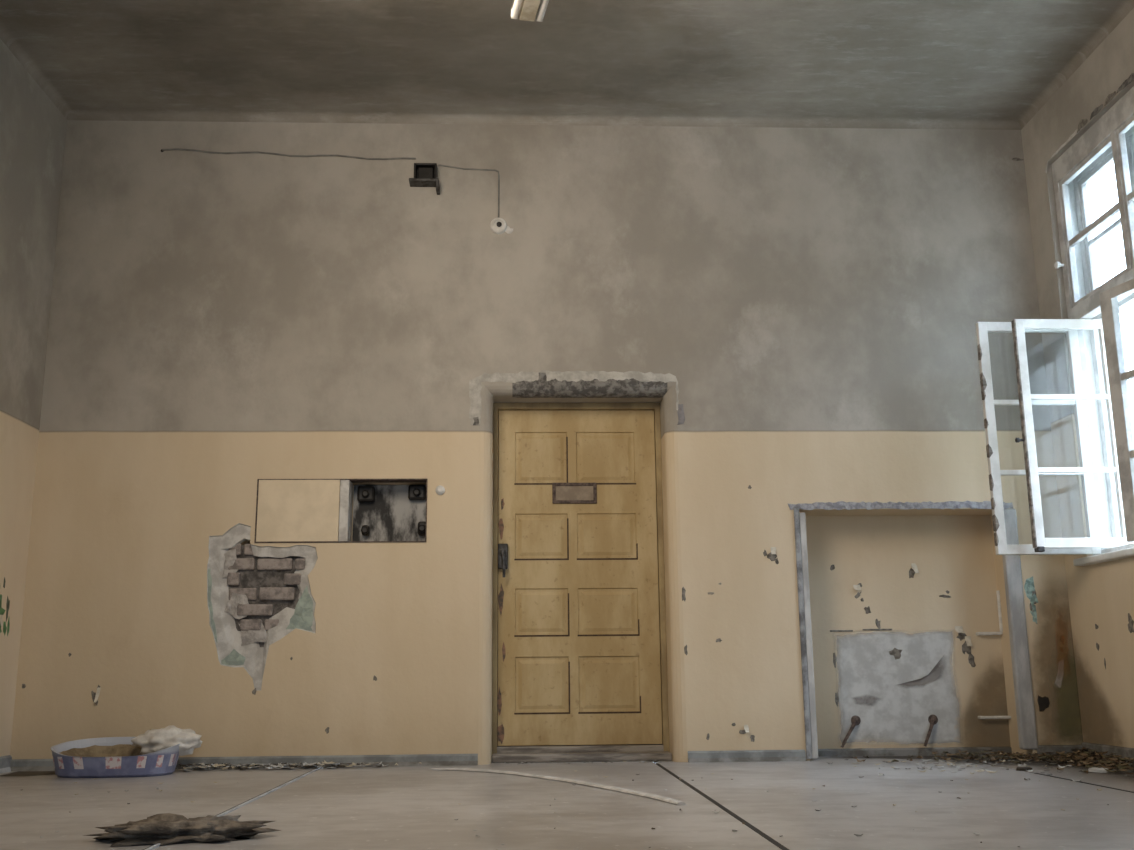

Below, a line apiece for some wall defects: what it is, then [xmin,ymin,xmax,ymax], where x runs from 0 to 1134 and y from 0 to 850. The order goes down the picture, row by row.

flaking render [469,370,685,426]
flaking render [207,523,318,695]
flaking render [830,583,976,743]